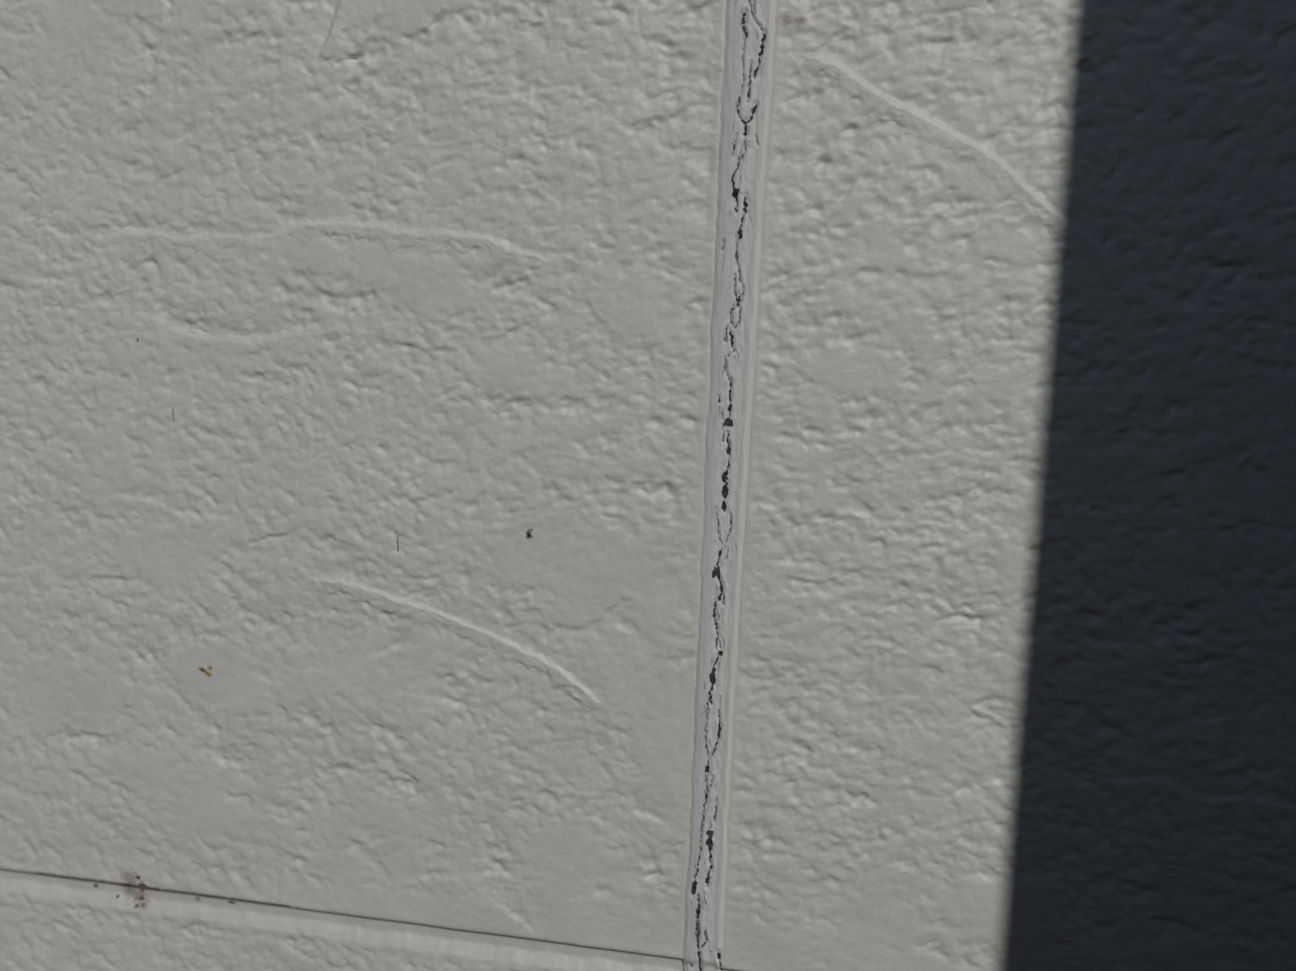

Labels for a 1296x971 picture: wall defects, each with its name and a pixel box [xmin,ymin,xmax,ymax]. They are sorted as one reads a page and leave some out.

crack [691,0,766,971]